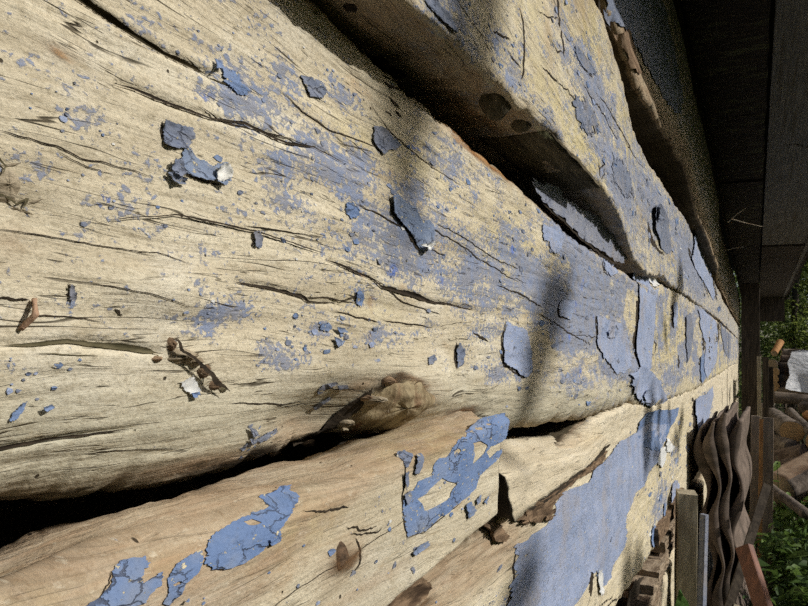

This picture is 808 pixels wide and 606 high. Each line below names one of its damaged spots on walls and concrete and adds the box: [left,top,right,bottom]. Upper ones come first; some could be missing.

crack [78,0,228,85]
peeling [598,0,684,113]
peeling [161,119,234,185]
peeling [386,183,438,261]
peeling [263,313,311,356]
peeling [497,135,732,606]
peeling [396,405,510,556]